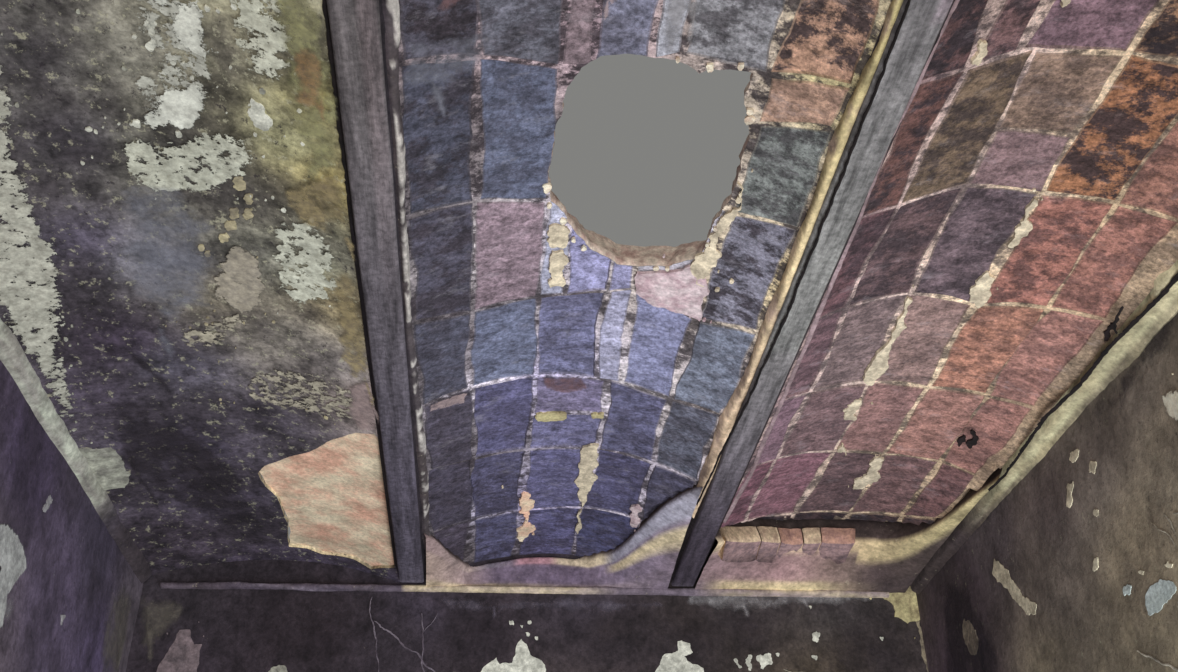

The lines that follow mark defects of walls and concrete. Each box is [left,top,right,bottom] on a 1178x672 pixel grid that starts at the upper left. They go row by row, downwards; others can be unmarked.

peeling [85,0,296,200]
damp [278,0,336,174]
peeling [0,90,79,432]
peeling [165,246,278,351]
peeling [264,196,339,307]
damp [351,383,379,431]
crack [988,273,1178,491]
peeling [79,442,131,491]
spalling [248,370,394,566]
peeling [0,524,26,628]
spalling [481,620,546,672]
spalling [655,640,704,672]